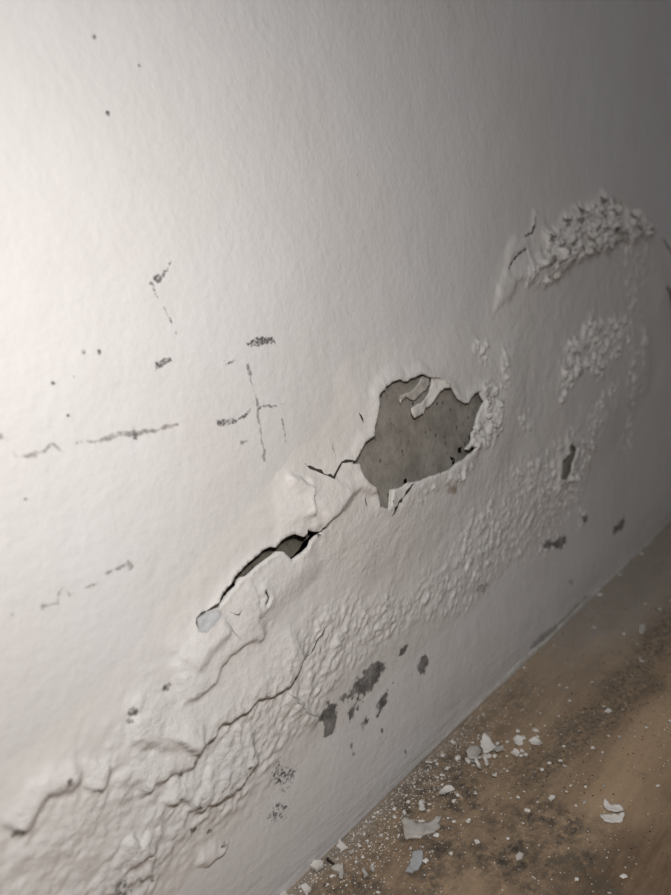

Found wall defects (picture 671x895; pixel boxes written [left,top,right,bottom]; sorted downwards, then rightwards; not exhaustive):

crack [217,399,276,457]
crack [196,603,268,635]
peeling [109,320,544,895]